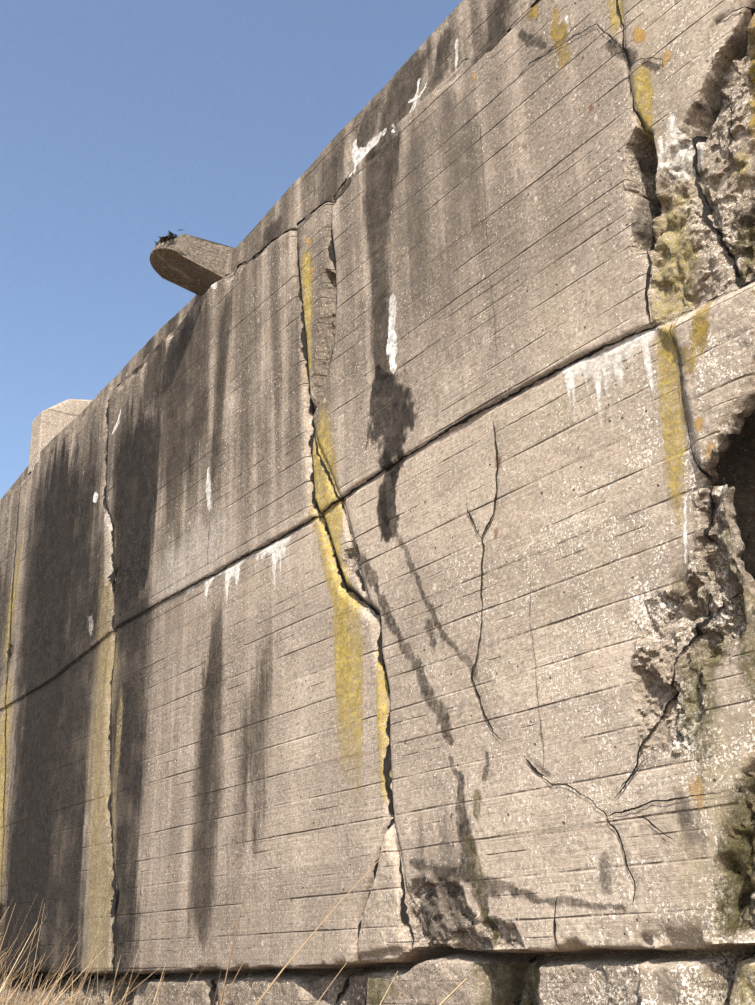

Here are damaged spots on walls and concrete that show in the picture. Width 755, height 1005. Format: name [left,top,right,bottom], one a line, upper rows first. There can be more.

spalling [622,2,755,329]
damp [558,328,657,407]
crack [645,250,724,551]
damp [0,293,232,991]
crack [103,381,152,1005]
damp [185,528,303,601]
crack [226,169,444,1005]
damp [358,550,409,652]
crack [467,420,502,740]
damp [410,661,625,938]
crack [523,592,755,1005]
spalling [629,483,750,768]